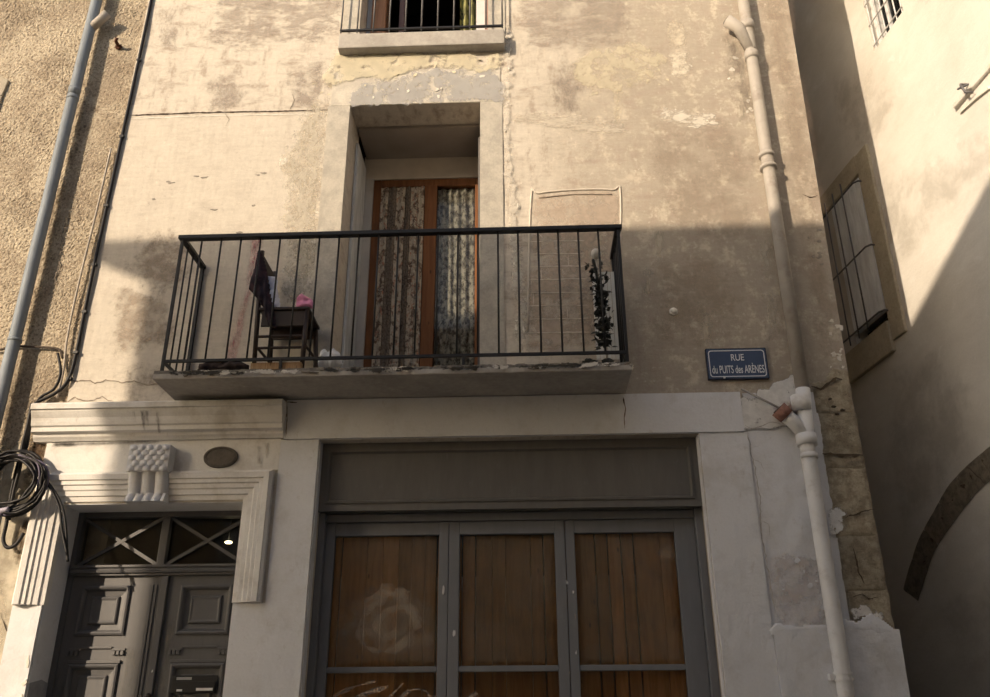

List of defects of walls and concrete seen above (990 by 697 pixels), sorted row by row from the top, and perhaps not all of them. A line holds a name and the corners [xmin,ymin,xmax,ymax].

crack [132,94,328,123]
flaking render [660,107,718,129]
peeling [280,52,510,298]
crack [65,379,157,403]
peeling [741,374,797,429]
flaking render [811,348,895,629]